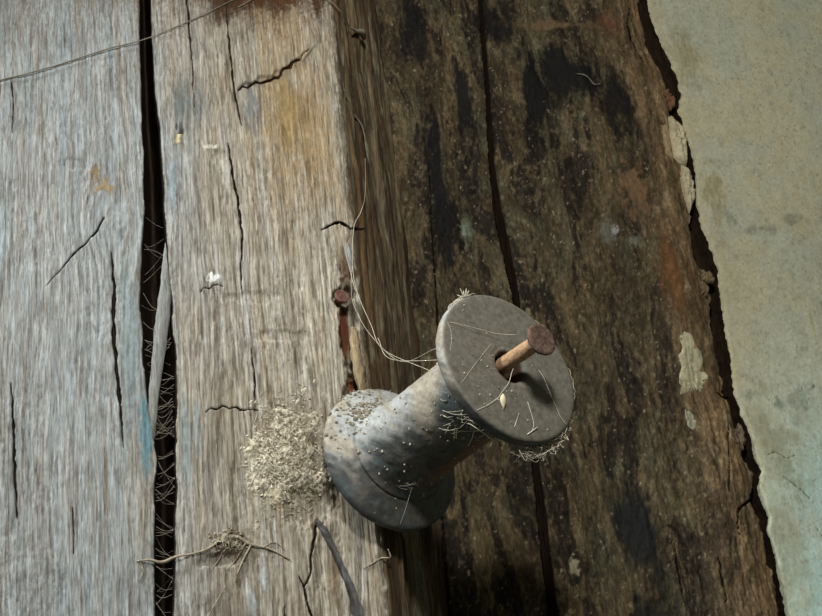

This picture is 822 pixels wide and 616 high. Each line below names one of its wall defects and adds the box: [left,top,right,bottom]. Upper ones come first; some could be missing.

crack [225,1,309,125]
crack [478,0,521,309]
crack [49,218,104,283]
crack [200,144,243,292]
corrosion [339,308,350,360]
corrosion [339,255,358,290]
corrosion [347,374,366,394]
peeling [678,332,708,394]
crack [627,0,806,616]
crack [299,521,317,616]
crack [529,446,559,616]